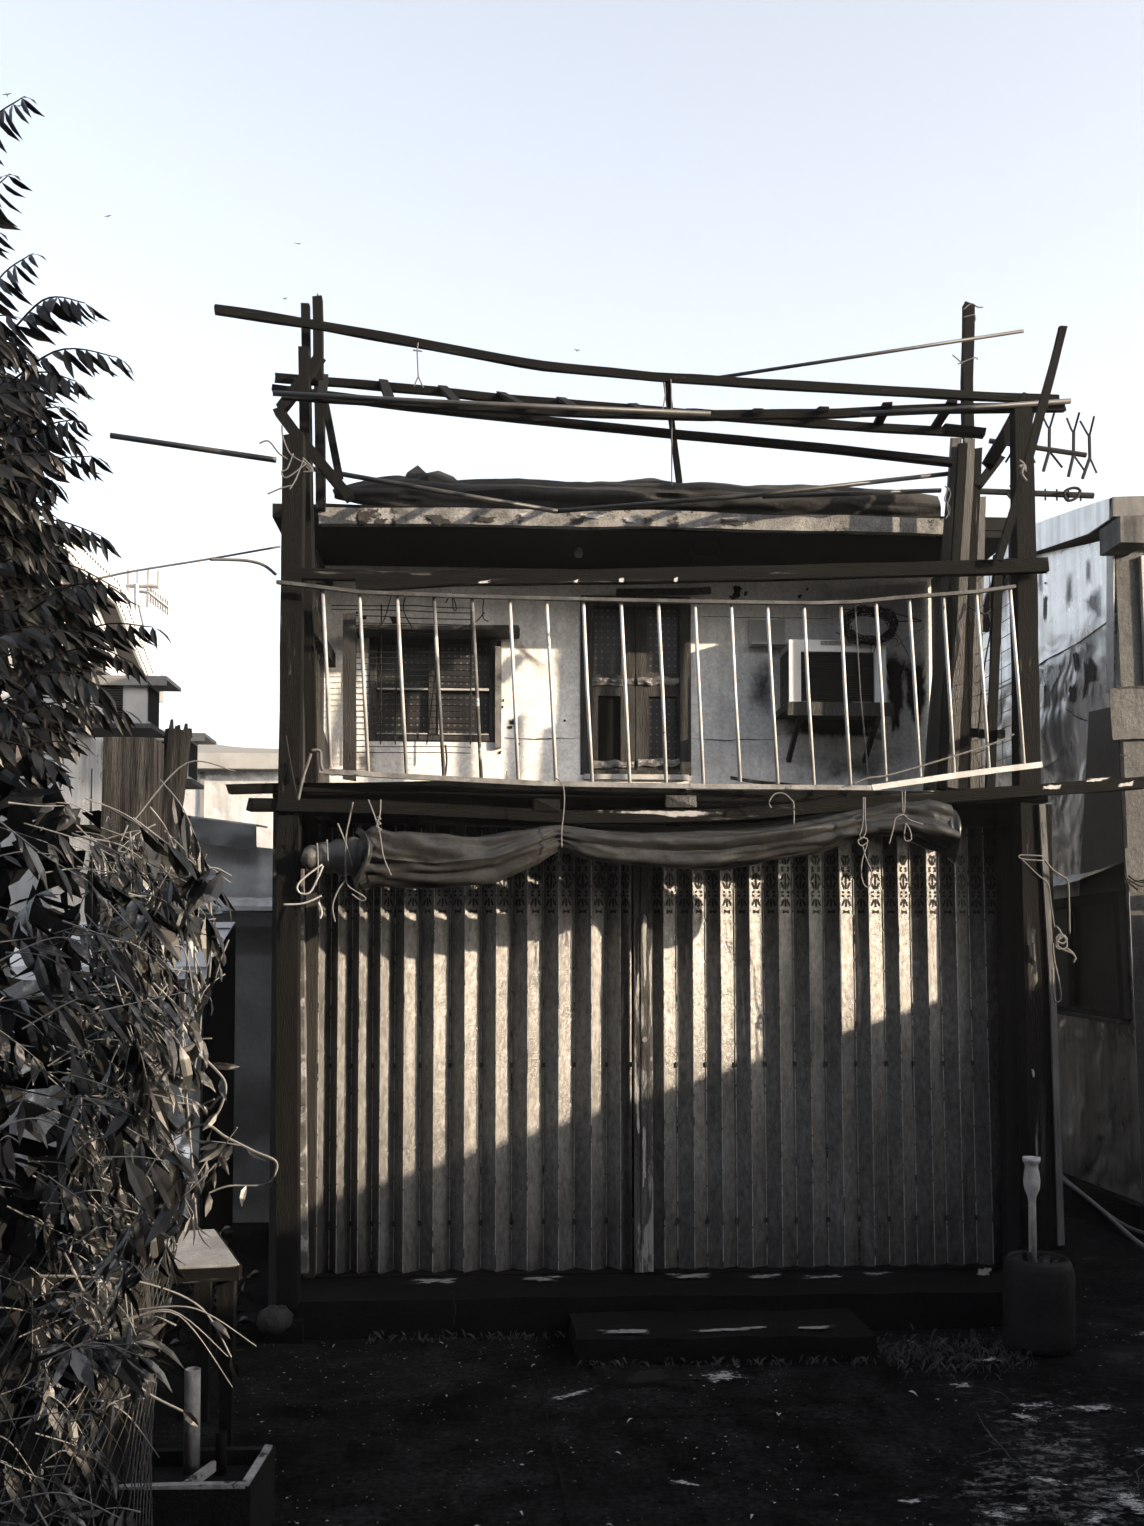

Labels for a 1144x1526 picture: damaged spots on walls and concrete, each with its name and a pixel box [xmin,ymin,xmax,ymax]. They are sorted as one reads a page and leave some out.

damp [754,668,770,703]
peeling [637,915,652,1027]
peeling [636,1085,646,1187]